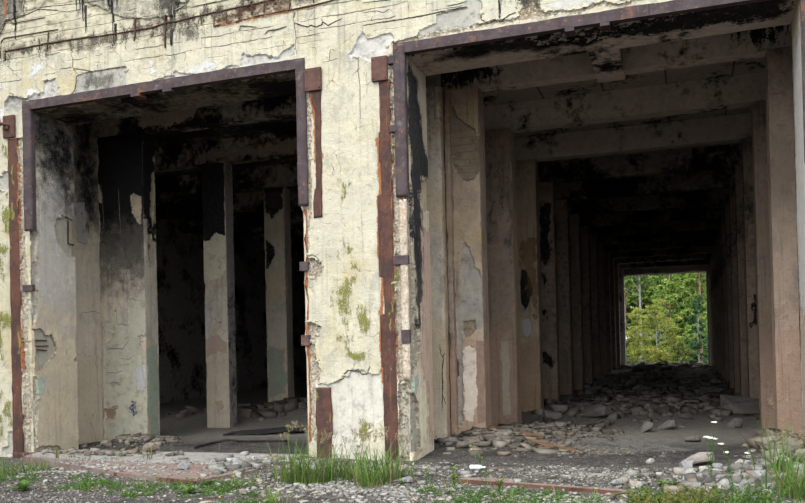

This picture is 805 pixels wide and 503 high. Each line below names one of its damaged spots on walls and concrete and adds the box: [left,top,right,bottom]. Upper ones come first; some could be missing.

crack [0,0,101,32]
crack [61,53,126,94]
leakage [0,0,284,99]
flaking render [0,0,333,62]
crack [175,0,225,10]
spalling [0,137,58,453]
flaking render [302,92,384,459]
leakage [330,242,367,365]
rust [375,137,395,259]
rust [378,265,397,318]
flaking render [348,0,645,459]
leakage [0,391,12,437]